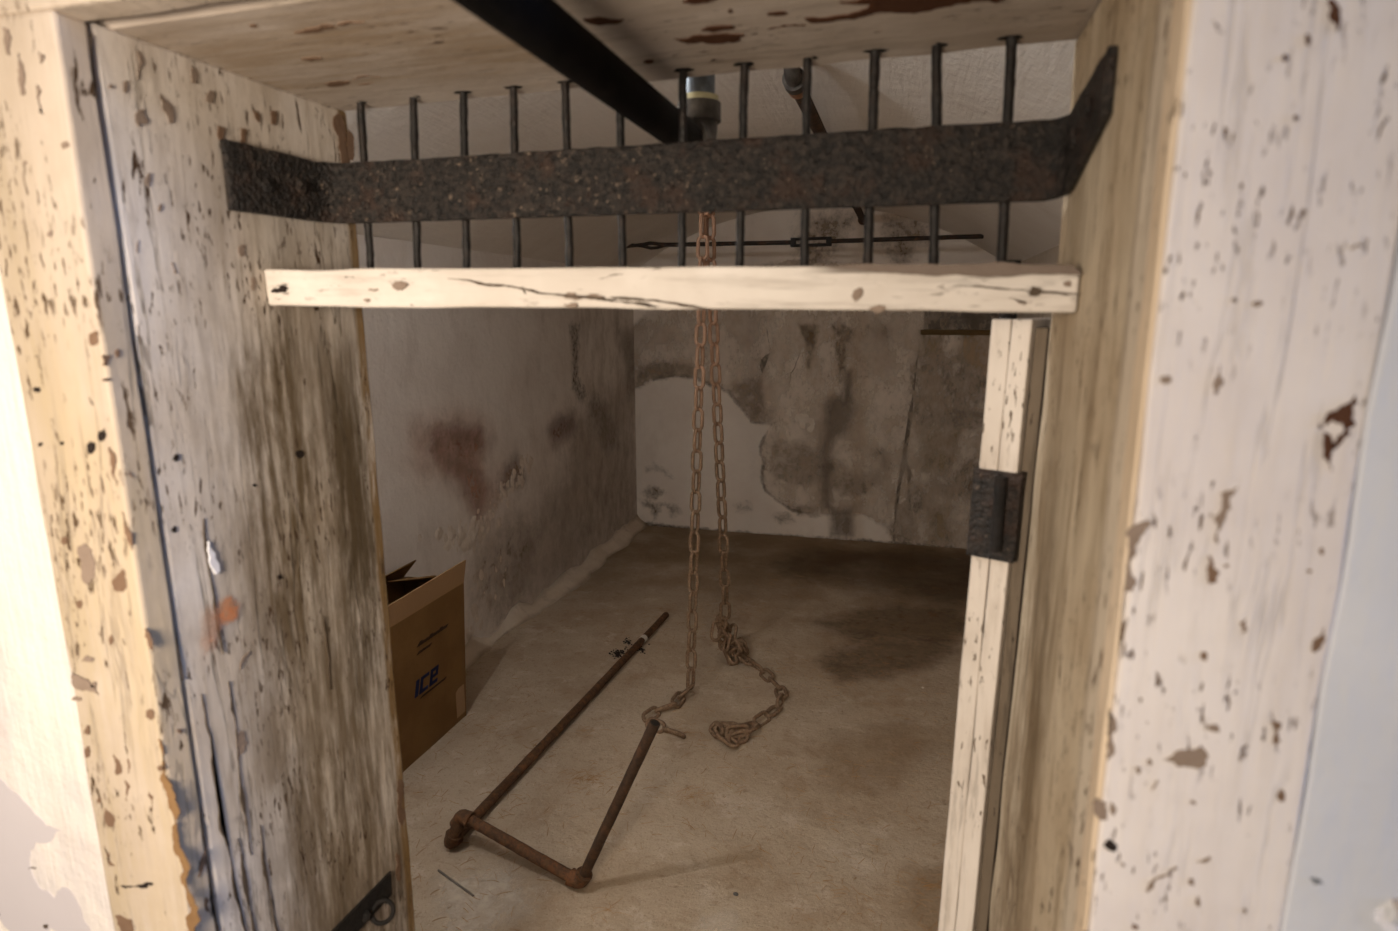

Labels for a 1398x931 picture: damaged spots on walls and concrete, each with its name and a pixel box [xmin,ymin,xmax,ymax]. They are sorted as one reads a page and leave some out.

peeling [674,9,744,44]
peeling [767,0,1002,30]
peeling [1328,0,1341,32]
crack [448,278,715,310]
crack [760,328,801,395]
peeling [1319,395,1358,471]
peeling [1124,521,1152,593]
peeling [1207,487,1238,584]
damp [823,606,965,679]
peeling [1136,746,1209,791]
peeling [0,779,91,931]
peeling [1103,839,1125,867]